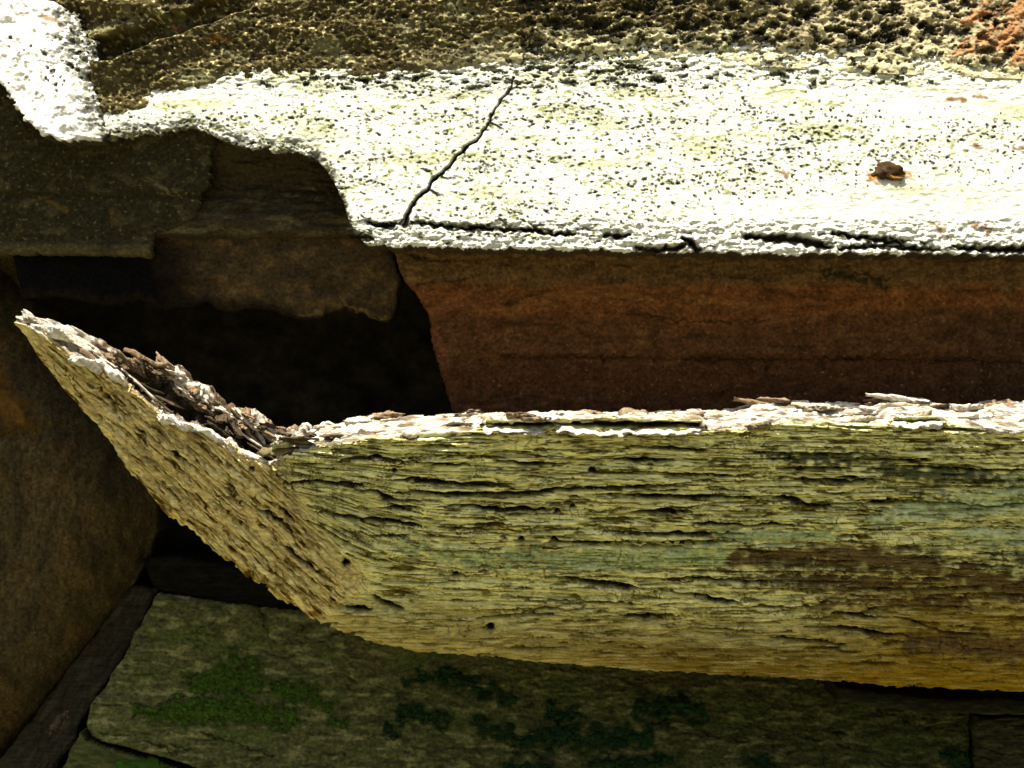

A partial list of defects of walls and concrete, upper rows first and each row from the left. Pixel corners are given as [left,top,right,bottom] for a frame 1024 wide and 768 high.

spalling [13,139,405,323]
crack [389,20,534,228]
rust [866,171,917,183]